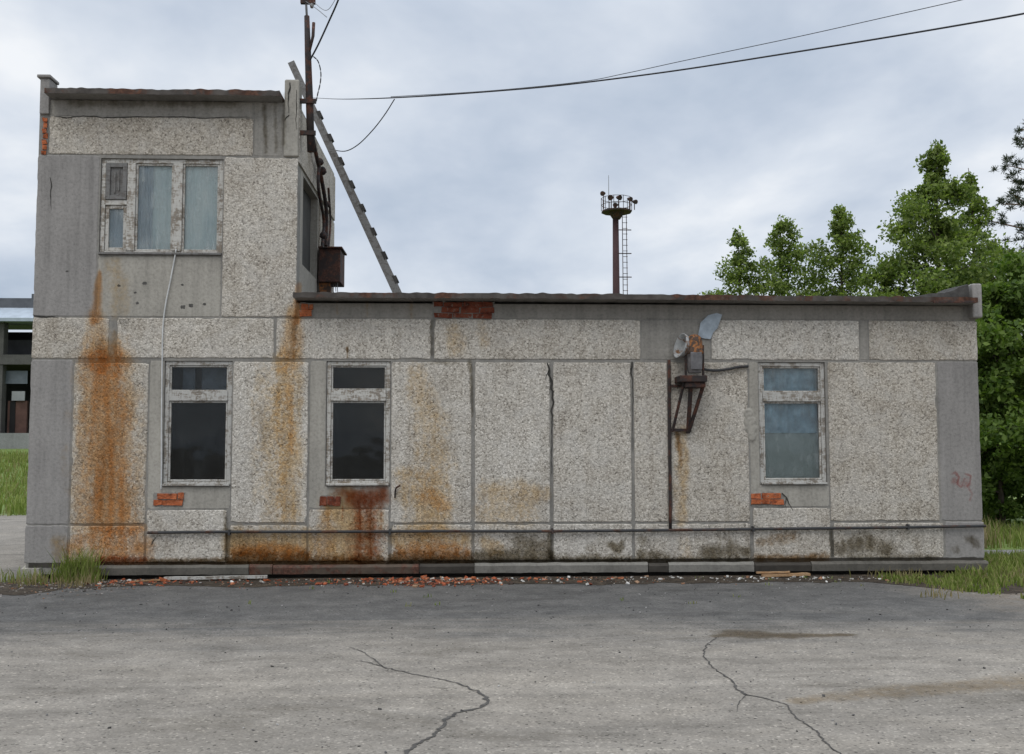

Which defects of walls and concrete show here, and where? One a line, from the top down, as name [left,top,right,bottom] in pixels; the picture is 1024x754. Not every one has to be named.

flaking render [432,301,496,320]
crack [545,363,555,473]
corrosion [98,556,148,564]
corrosion [337,486,389,564]